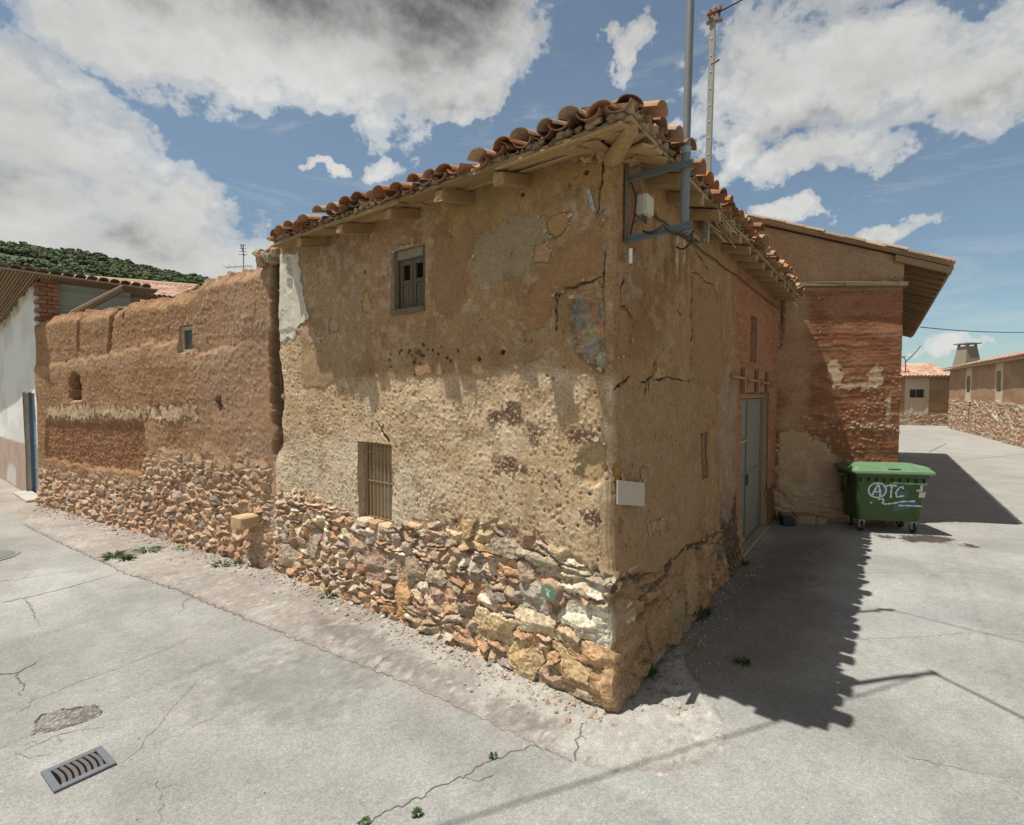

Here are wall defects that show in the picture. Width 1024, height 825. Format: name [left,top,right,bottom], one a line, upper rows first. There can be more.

flaking render [470,205,554,285]
flaking render [278,251,325,344]
spalling [555,276,606,372]
crack [614,252,716,394]
flaking render [827,359,900,434]
flaking render [775,428,846,522]